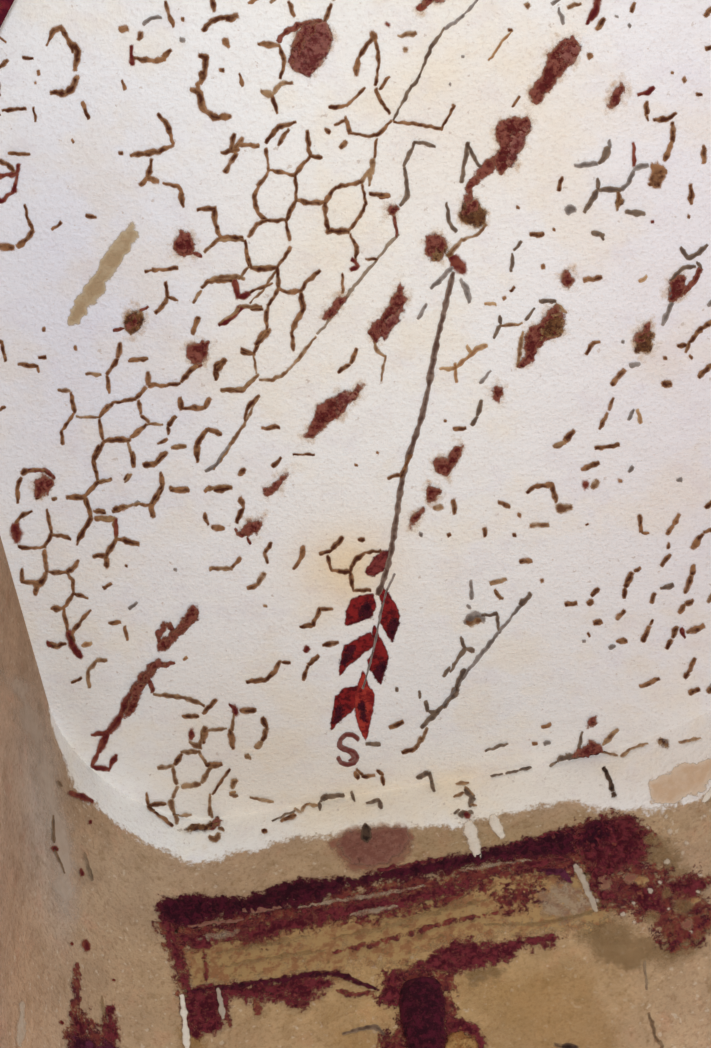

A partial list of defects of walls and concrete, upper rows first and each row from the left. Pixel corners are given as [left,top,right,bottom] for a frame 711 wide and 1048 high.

corrosion [0,0,14,27]
crack [0,151,35,251]
crack [574,86,677,241]
crack [10,0,436,688]
crack [439,299,556,384]
crack [442,591,504,709]
corrosion [683,657,711,696]
crack [145,660,383,827]
corrosion [151,823,586,996]
spalling [564,759,711,956]
spalling [62,962,121,1048]
corrosion [336,960,487,1048]